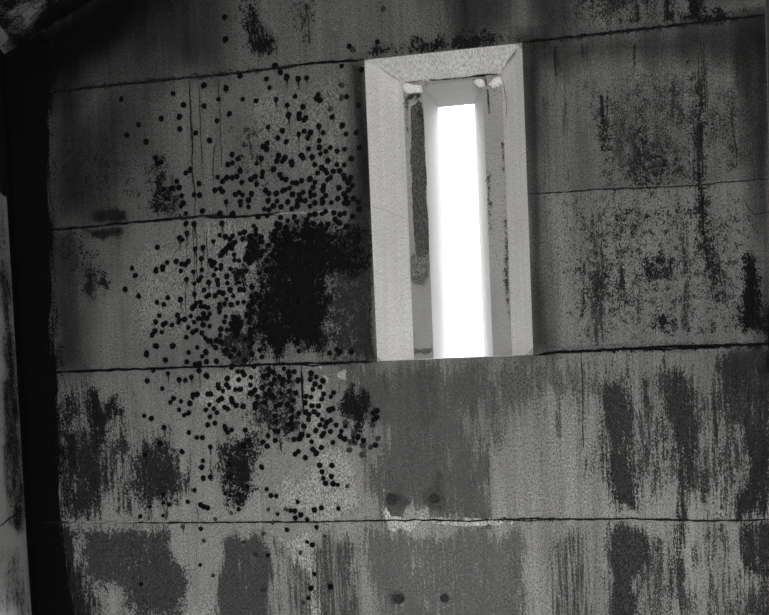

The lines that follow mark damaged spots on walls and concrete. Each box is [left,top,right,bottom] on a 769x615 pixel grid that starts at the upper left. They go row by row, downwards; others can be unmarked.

damp [233,0,309,99]
damp [346,0,522,58]
damp [193,82,207,162]
damp [215,81,232,139]
damp [284,102,309,127]
damp [297,128,314,142]
damp [339,102,367,193]
damp [184,345,219,383]
damp [203,402,219,428]
damp [317,462,349,488]
damp [276,499,310,522]
damp [546,527,593,615]